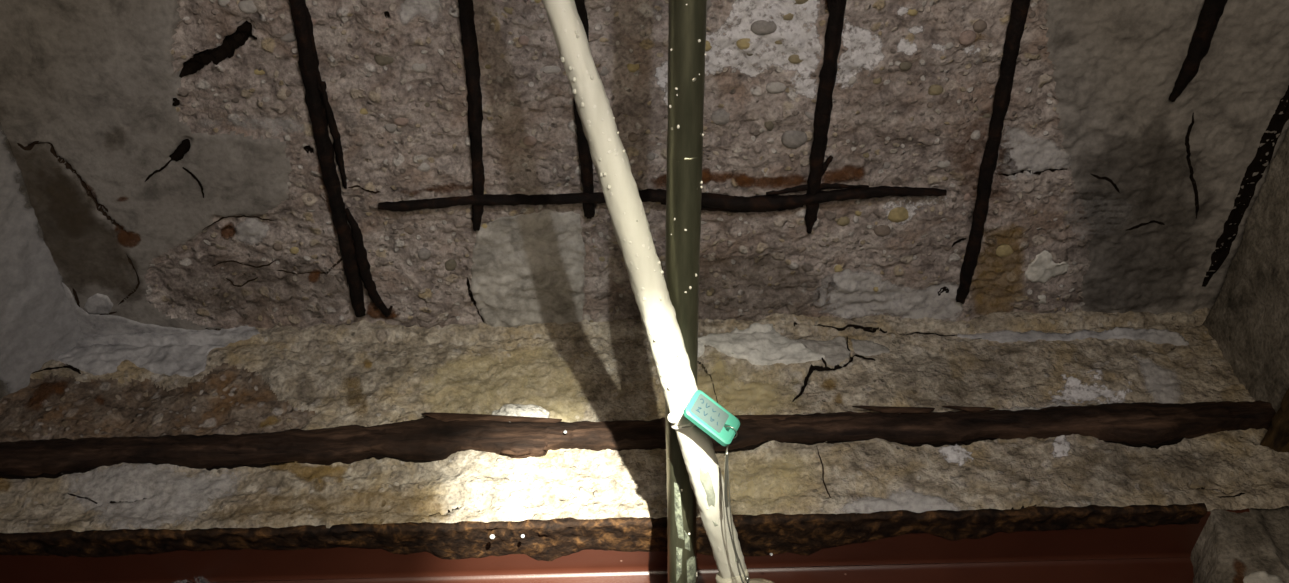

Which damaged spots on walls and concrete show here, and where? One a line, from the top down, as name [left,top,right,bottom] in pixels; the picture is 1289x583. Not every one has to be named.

damp [655,62,668,105]
damp [705,0,823,99]
damp [835,7,946,88]
spalling [585,0,669,278]
crack [17,141,140,315]
spalling [0,0,641,442]
corrosion [701,155,869,213]
spalling [698,0,1189,366]
corrosion [422,412,562,423]
corrosion [500,445,547,456]
crack [792,322,982,402]
corrosion [825,381,995,414]